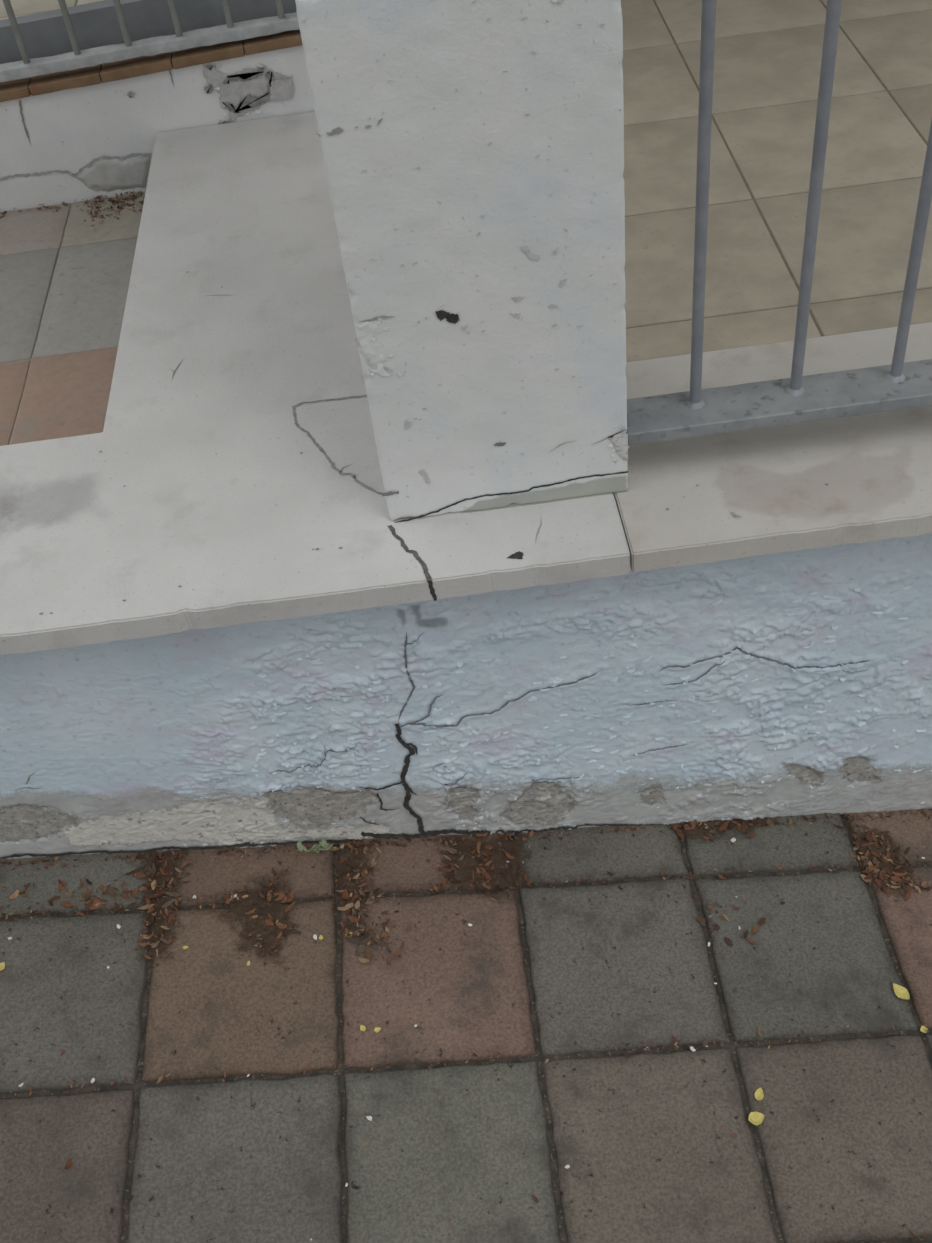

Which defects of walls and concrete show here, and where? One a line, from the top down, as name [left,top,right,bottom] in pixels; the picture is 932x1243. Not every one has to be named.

flaking render [203,63,293,124]
crack [292,395,382,495]
crack [550,430,626,452]
crack [388,471,628,601]
crack [626,647,875,706]
peeling [0,698,398,847]
crack [0,632,781,859]
flaking render [421,701,682,827]